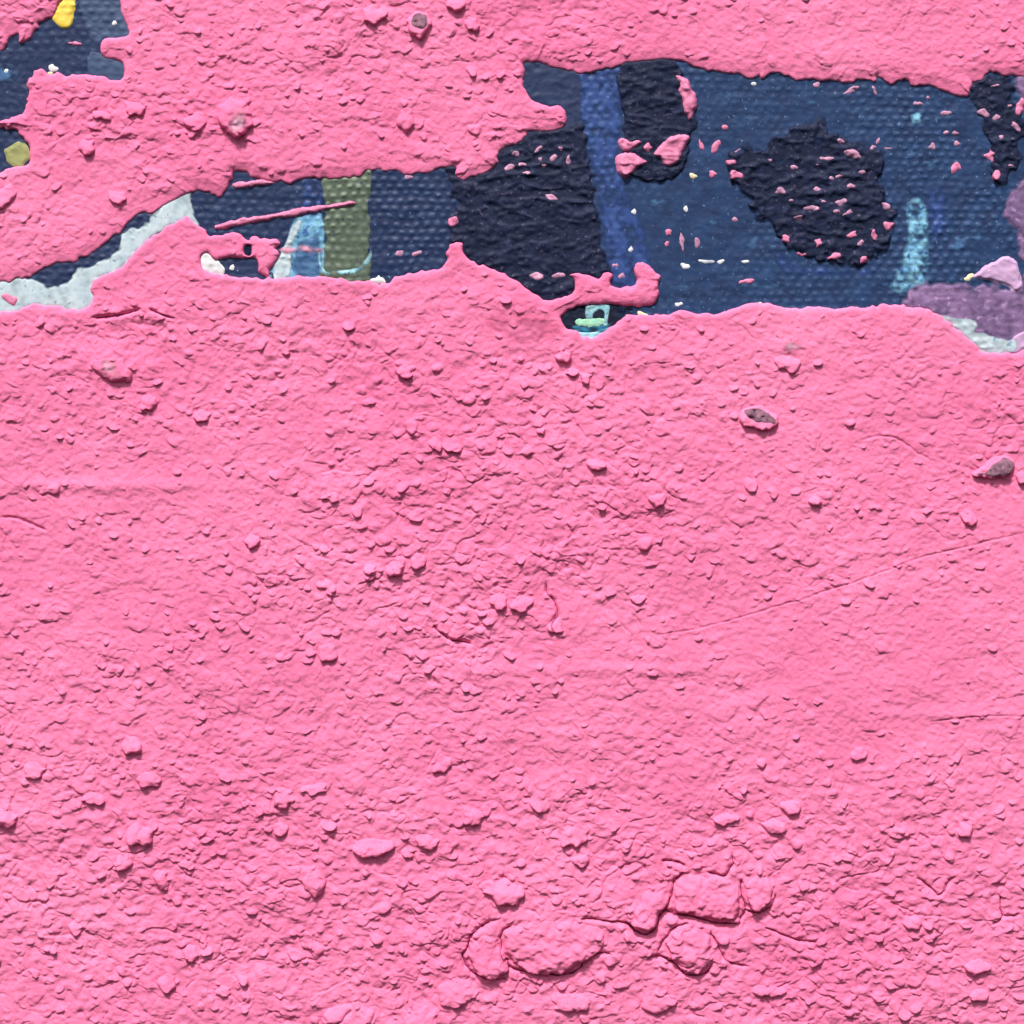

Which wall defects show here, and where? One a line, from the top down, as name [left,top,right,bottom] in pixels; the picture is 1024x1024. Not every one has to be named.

peeling [0,0,129,173]
peeling [0,59,1024,354]
crack [461,919,610,980]
crack [583,856,814,976]